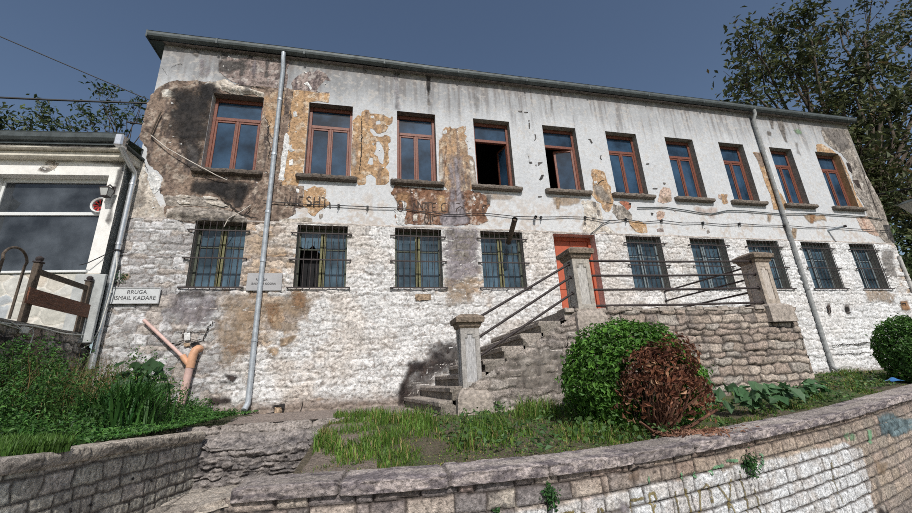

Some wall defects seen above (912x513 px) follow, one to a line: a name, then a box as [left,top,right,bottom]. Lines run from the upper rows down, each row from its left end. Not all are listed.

water stain [170,47,289,167]
water stain [234,186,246,207]
peeling [351,110,393,185]
peeling [439,125,477,201]
flaking render [581,155,676,233]
water stain [399,342,457,404]